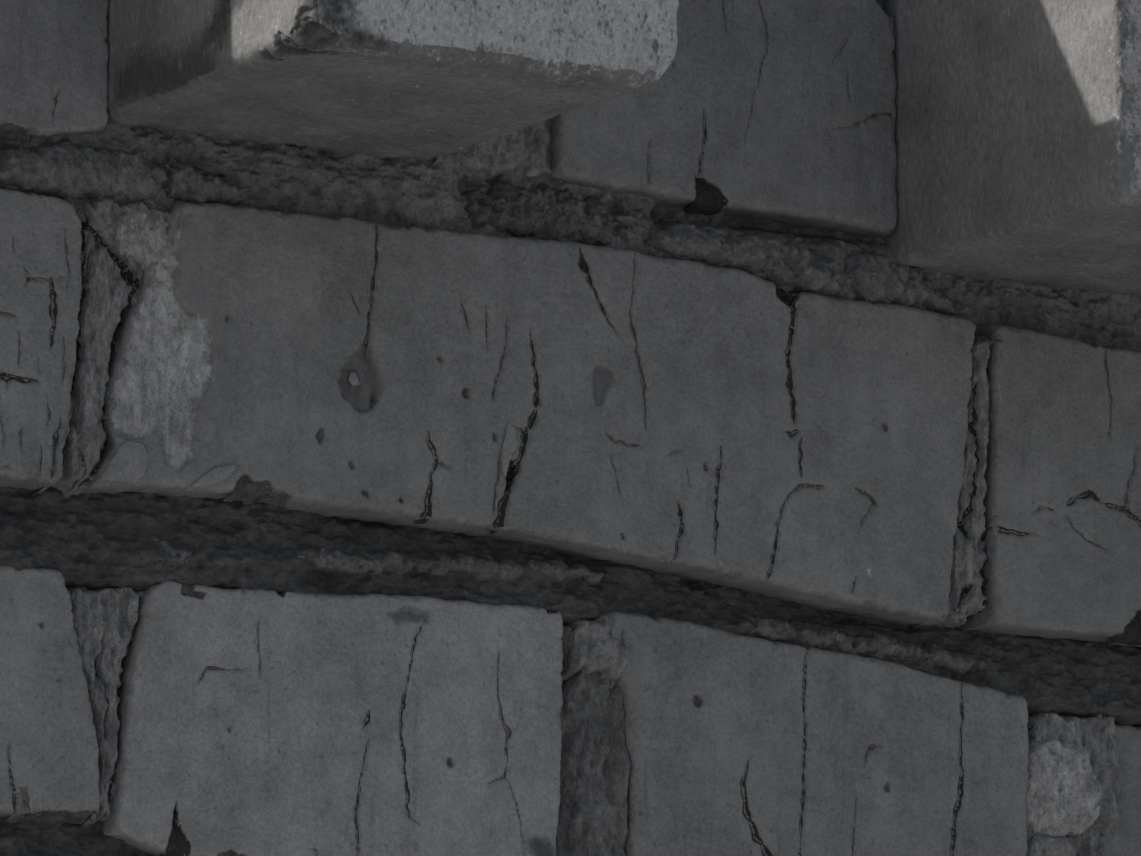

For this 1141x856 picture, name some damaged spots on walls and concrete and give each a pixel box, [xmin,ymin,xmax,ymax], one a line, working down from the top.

leakage [209,0,242,39]
crack [0,208,140,490]
crack [349,220,378,354]
crack [461,298,539,534]
crack [766,290,824,579]
crack [854,487,876,533]
crack [953,340,1141,619]
crack [354,710,370,851]
crack [399,620,425,823]
crack [489,652,524,843]
crack [740,648,808,856]
crack [950,683,964,856]